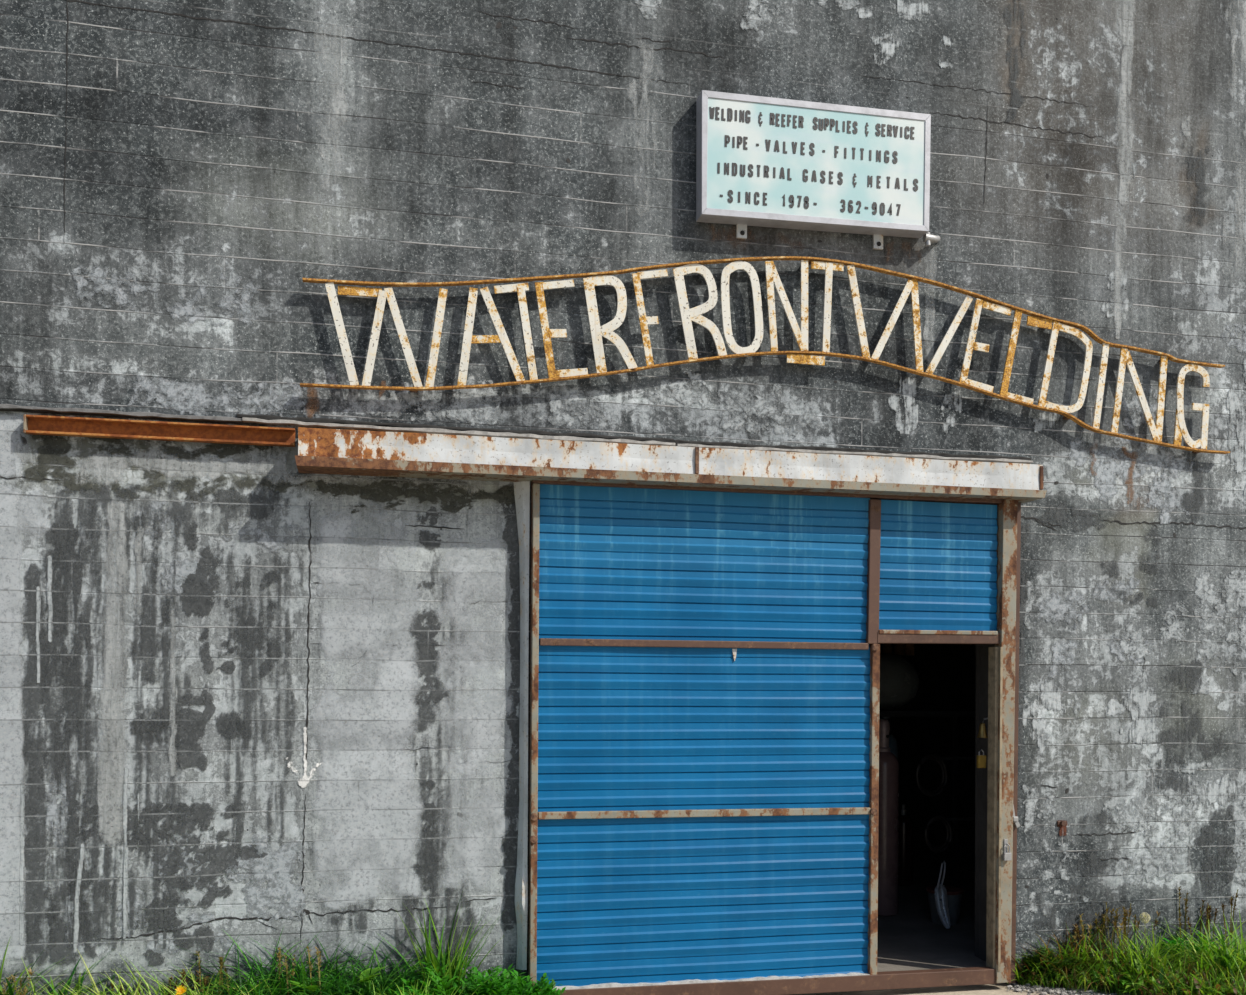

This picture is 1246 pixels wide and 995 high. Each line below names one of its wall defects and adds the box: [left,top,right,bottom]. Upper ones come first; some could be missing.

crack [63,0,723,235]
crack [1021,516,1062,531]
crack [1093,515,1246,529]
damp [0,414,520,966]
damp [1158,660,1226,794]
damp [1195,805,1234,894]